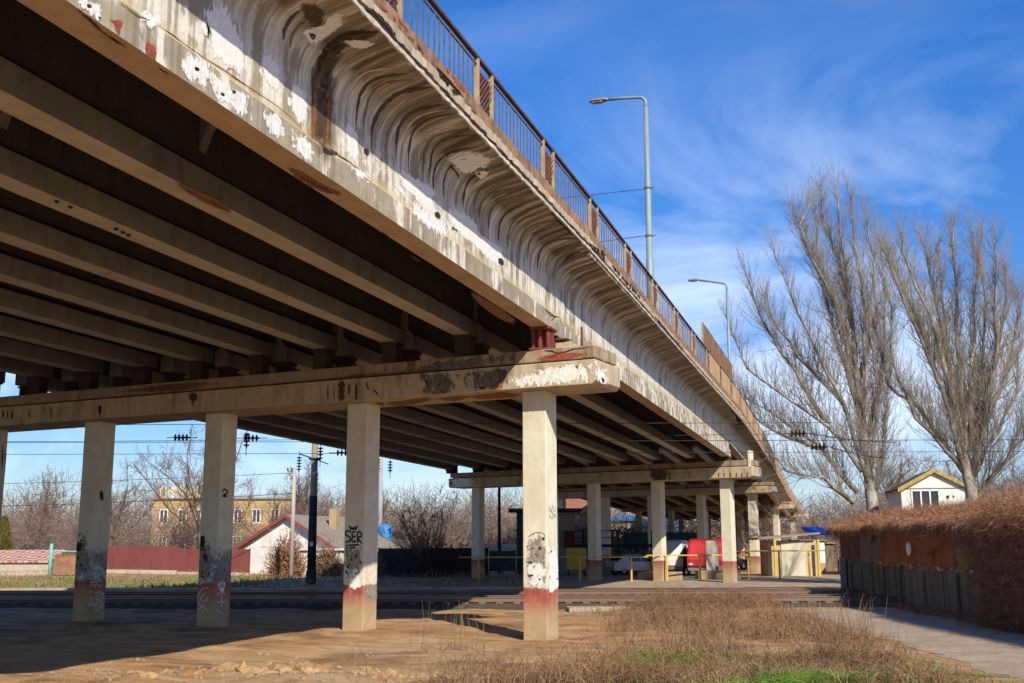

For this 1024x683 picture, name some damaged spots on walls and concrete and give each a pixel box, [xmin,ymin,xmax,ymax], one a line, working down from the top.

peeling [77,0,126,48]
peeling [181,0,375,196]
corrosion [311,89,334,160]
damp [311,31,377,147]
peeling [419,360,609,395]
corrosion [538,352,588,361]
peeling [75,530,89,581]
peeling [198,536,232,592]
peeling [344,542,377,602]
peeling [523,533,558,593]